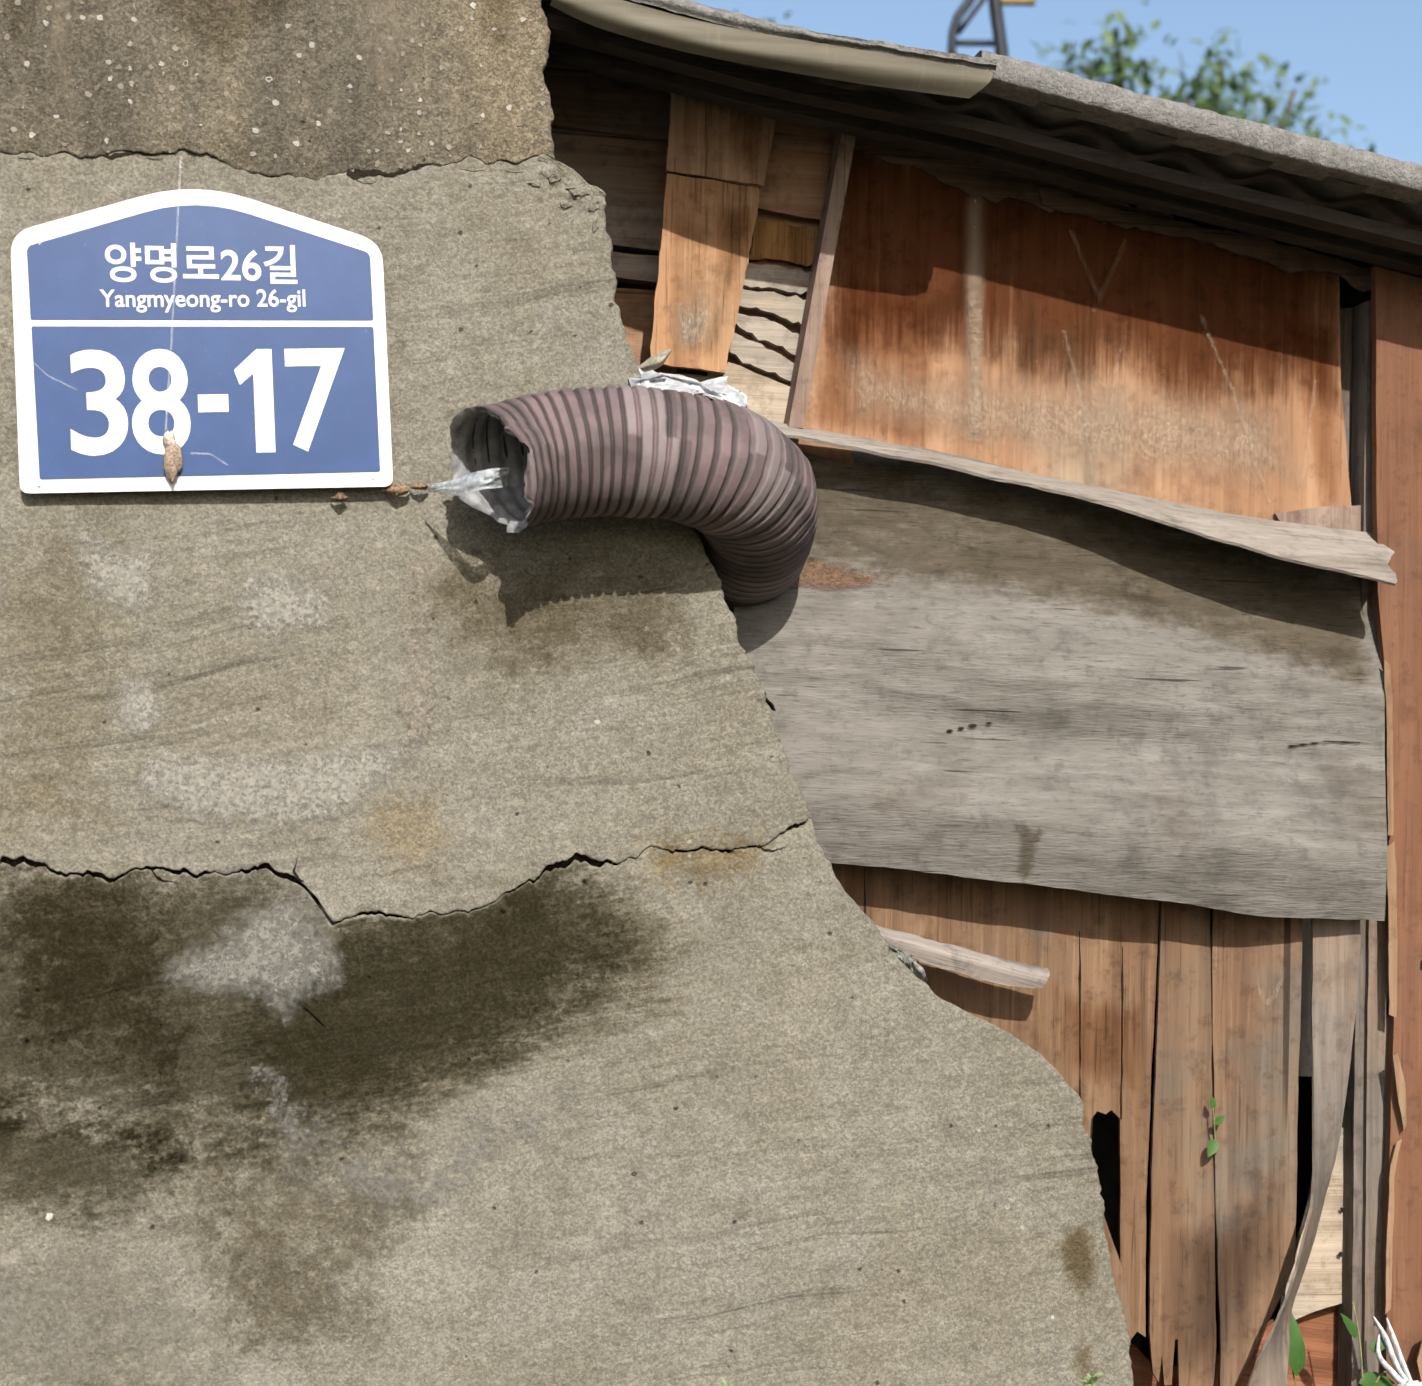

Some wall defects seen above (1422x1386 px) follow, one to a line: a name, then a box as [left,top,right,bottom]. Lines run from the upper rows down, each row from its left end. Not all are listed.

crack [103,151,178,160]
crack [346,163,526,184]
crack [0,823,801,925]
leakage [177,901,336,1005]